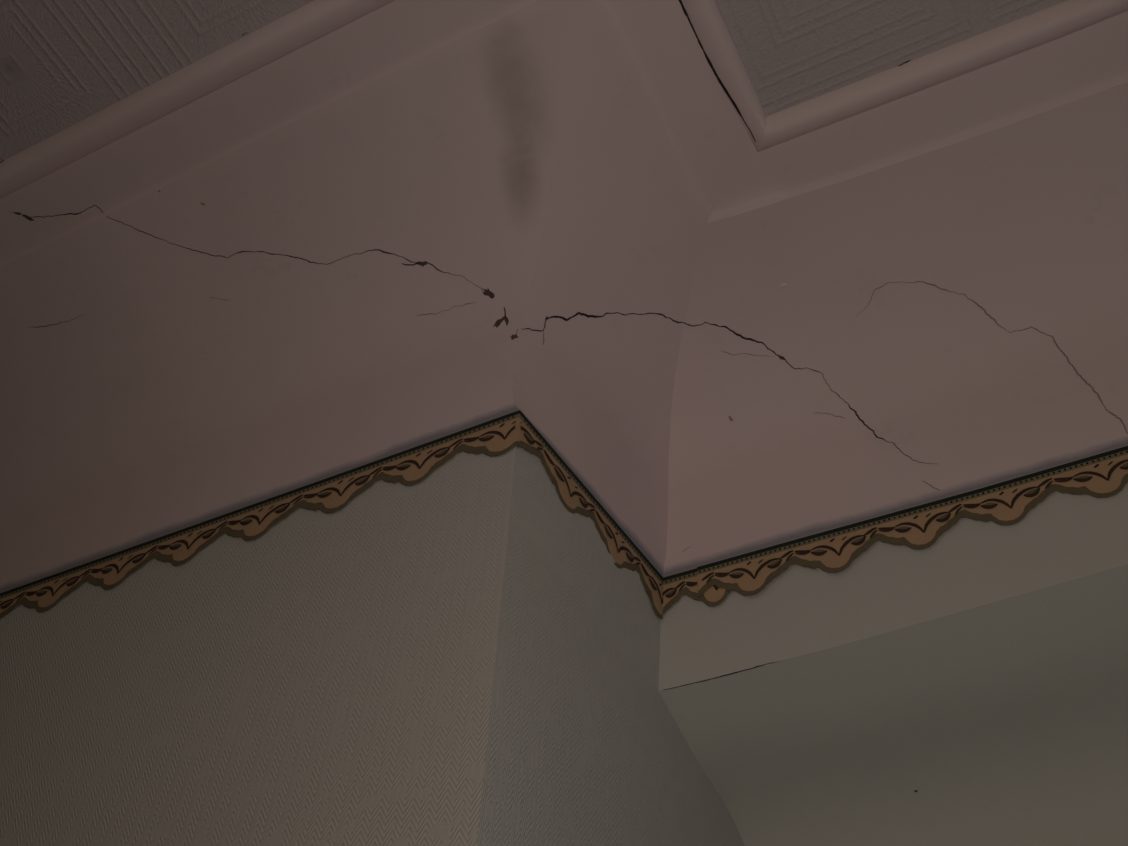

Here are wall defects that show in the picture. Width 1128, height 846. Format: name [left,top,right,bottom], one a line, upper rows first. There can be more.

crack [678,0,756,142]
crack [14,205,495,317]
crack [510,312,940,491]
crack [857,281,1128,434]